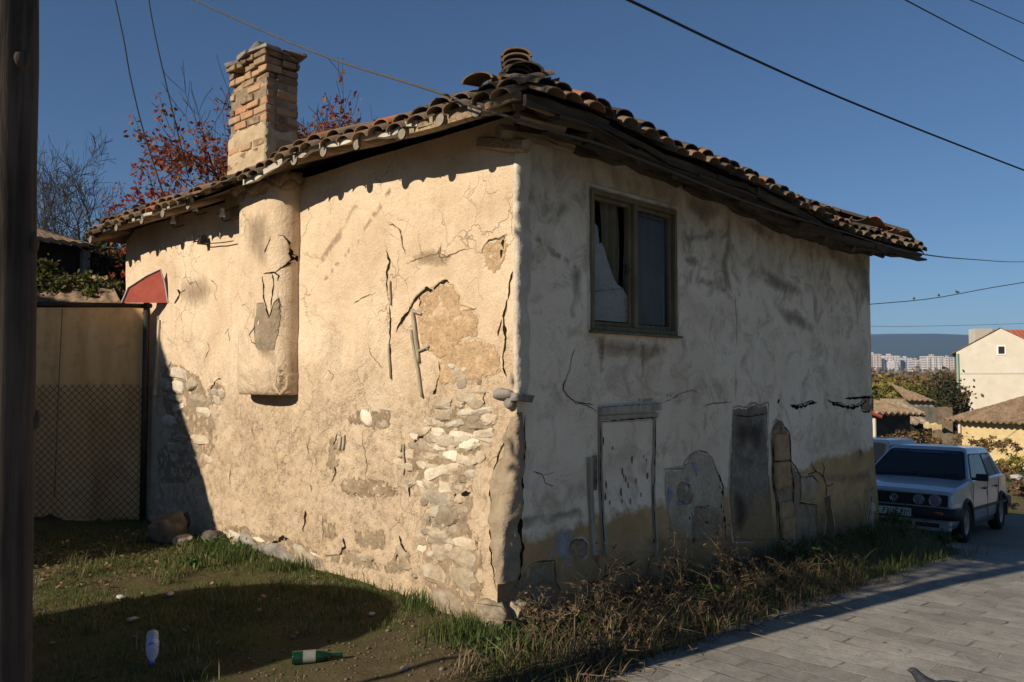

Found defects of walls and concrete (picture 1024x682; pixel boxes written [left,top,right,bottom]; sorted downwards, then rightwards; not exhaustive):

flaking render [158,360,227,484]
crack [204,235,298,389]
flaking render [222,281,570,631]
crack [355,223,472,382]
flaking render [480,232,508,272]
crack [482,237,513,404]
crack [563,347,596,411]
flaking render [664,401,835,552]
crack [778,397,873,413]